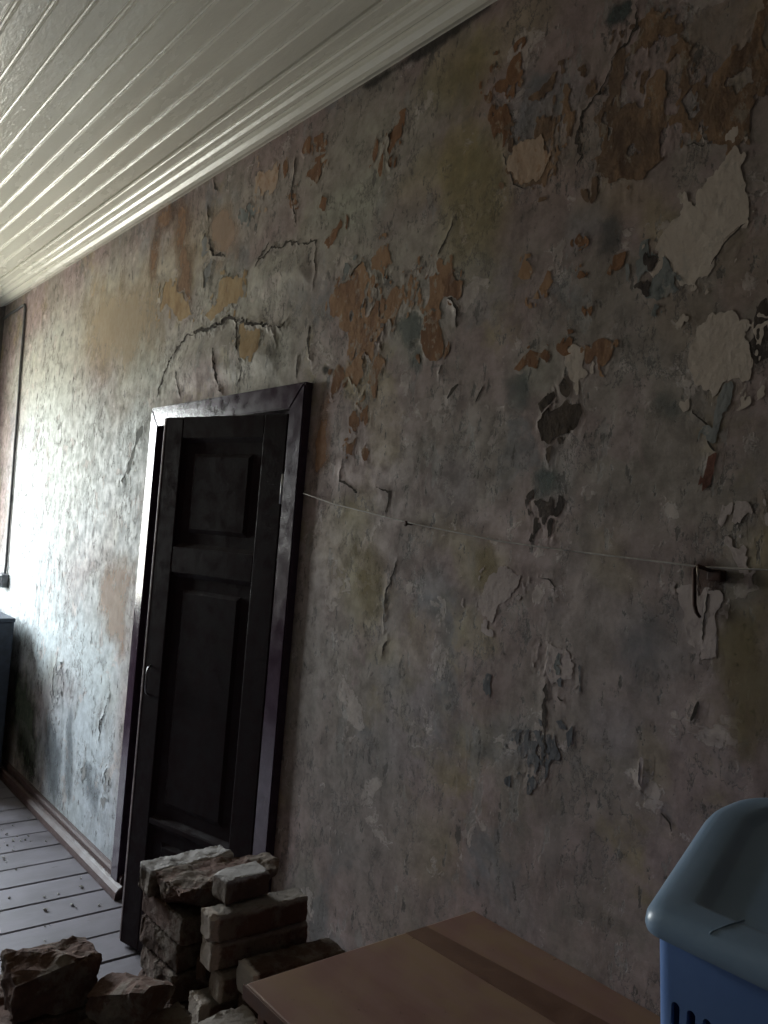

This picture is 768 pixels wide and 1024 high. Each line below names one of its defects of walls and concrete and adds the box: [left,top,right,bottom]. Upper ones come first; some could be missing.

peeling [479,37,596,204]
peeling [155,225,265,365]
crack [154,156,321,405]
peeling [278,128,463,469]
peeling [604,0,768,449]
flaking render [509,328,623,474]
peeling [670,487,768,671]
peeling [527,634,587,697]
peeling [498,714,578,795]